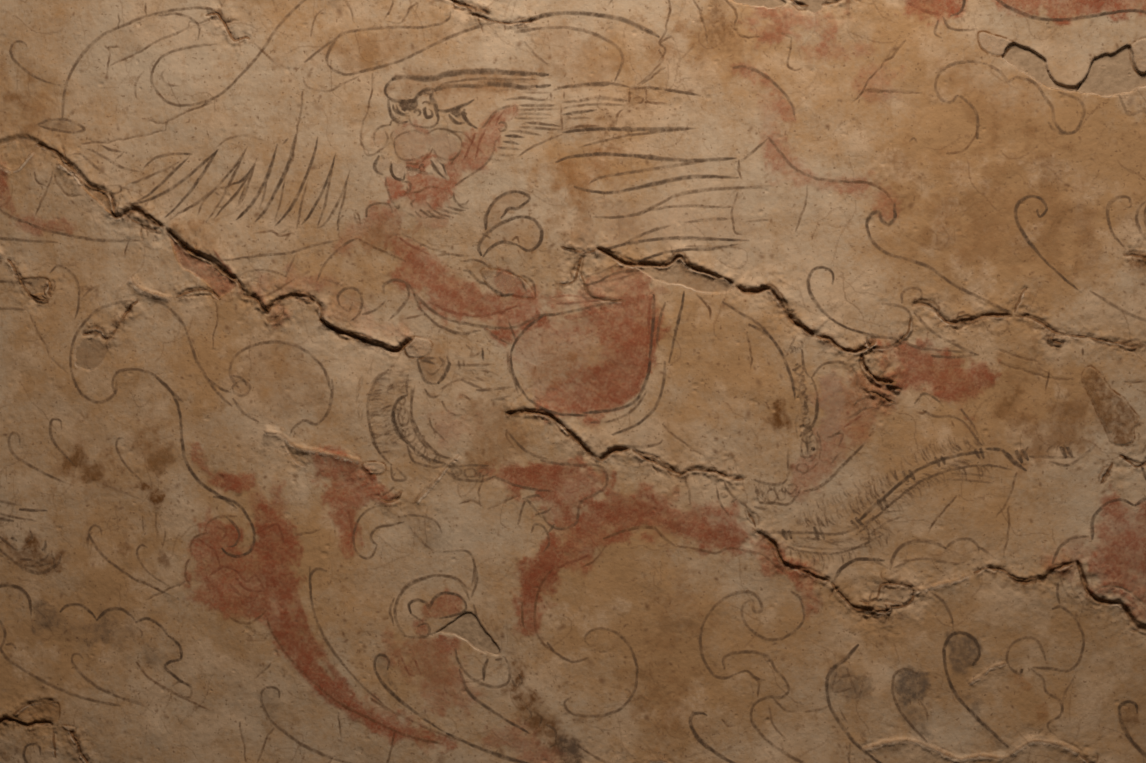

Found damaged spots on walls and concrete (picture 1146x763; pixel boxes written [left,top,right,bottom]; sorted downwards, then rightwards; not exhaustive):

crack [451,0,537,28]
crack [791,0,841,8]
flaking render [978,31,1146,97]
crack [0,143,413,353]
crack [559,246,1146,403]
crack [505,410,744,481]
crack [1101,454,1146,483]
crack [748,512,1138,631]